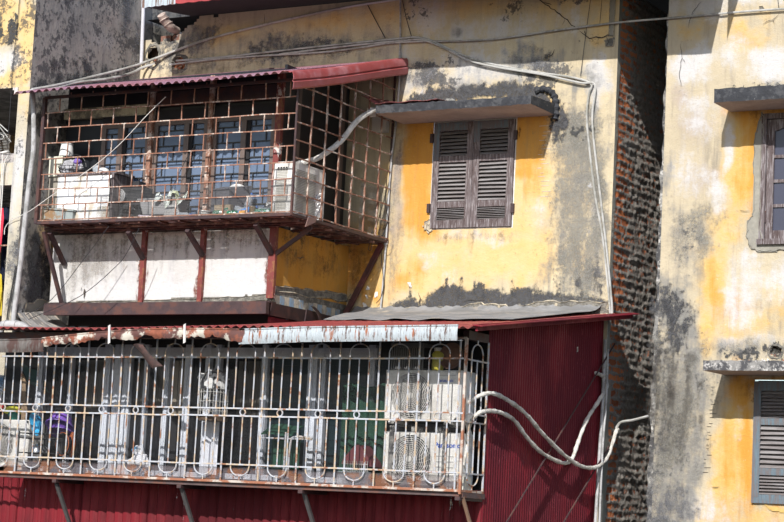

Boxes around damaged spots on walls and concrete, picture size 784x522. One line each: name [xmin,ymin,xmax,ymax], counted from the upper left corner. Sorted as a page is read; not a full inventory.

leakage [0,13,19,45]
crack [540,0,613,46]
leakage [33,56,140,89]
leakage [393,62,610,308]
leakage [720,341,783,360]
leakage [642,284,700,468]